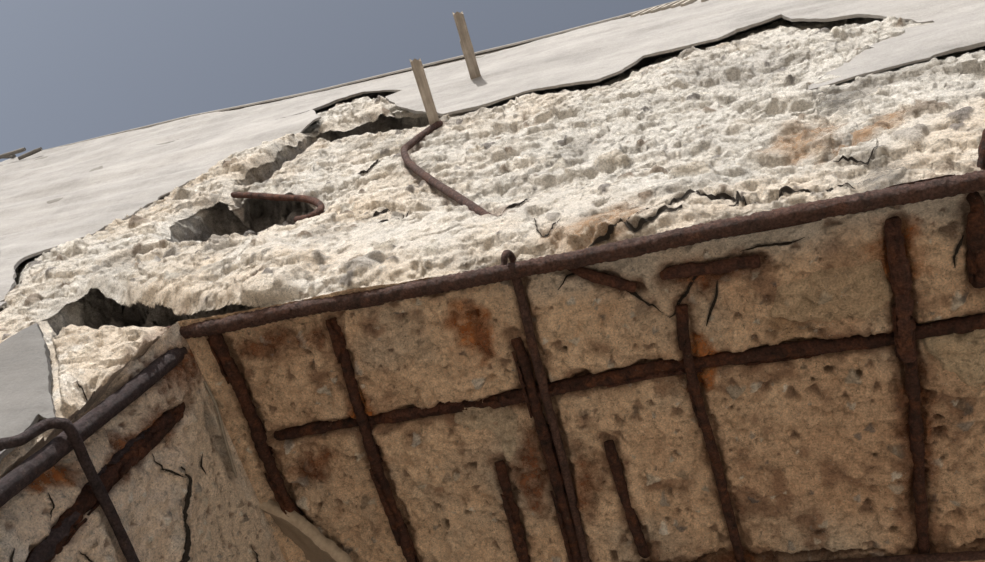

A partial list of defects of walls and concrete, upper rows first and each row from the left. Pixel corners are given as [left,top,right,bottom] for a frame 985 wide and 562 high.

spalling [0,16,985,438]
crack [588,189,756,248]
crack [779,138,878,198]
corrosion [886,174,955,188]
corrosion [28,502,100,562]
corrosion [98,405,184,493]
crack [152,453,206,562]
spalling [71,279,538,562]
spalling [372,402,569,562]
corrosion [607,306,721,428]
spalling [540,345,918,562]
spalling [915,329,985,562]